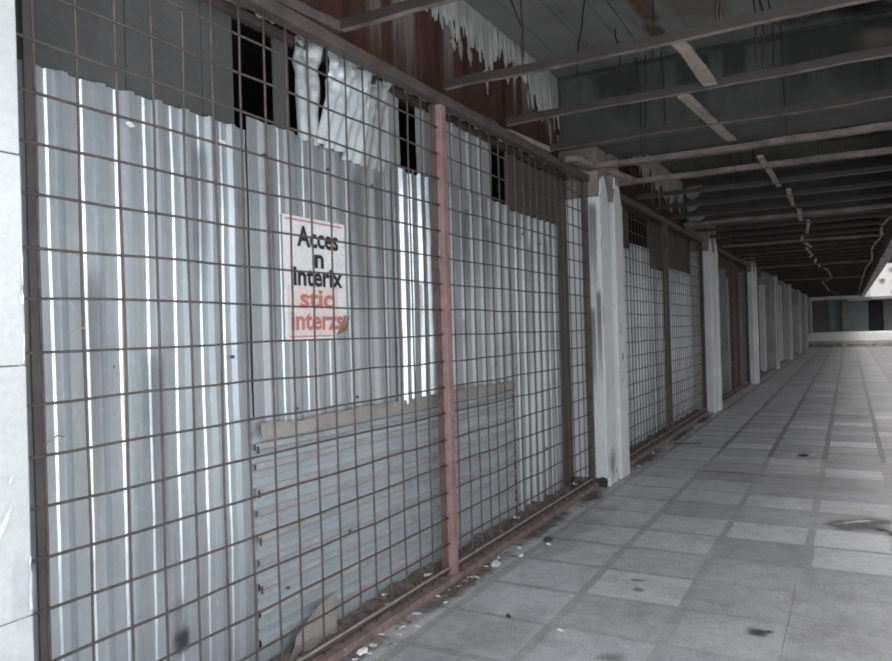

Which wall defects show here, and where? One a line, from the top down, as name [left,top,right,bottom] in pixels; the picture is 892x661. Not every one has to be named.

rust [462,28,475,75]
peeling [426,0,560,143]